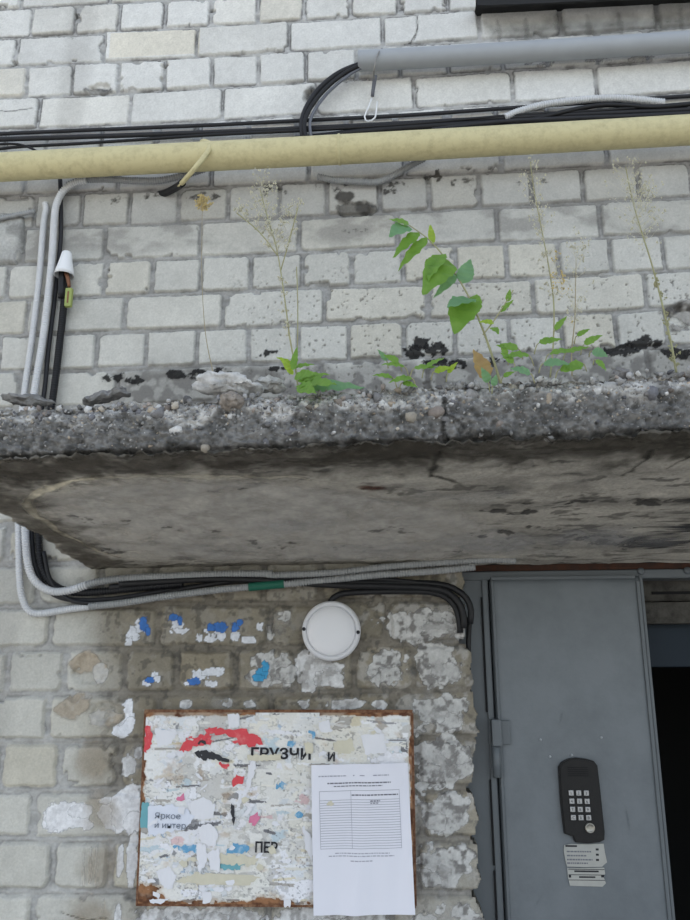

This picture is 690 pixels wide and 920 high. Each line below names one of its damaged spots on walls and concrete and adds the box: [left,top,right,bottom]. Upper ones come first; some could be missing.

spalling [0,365,690,455]
water stain [0,427,690,567]